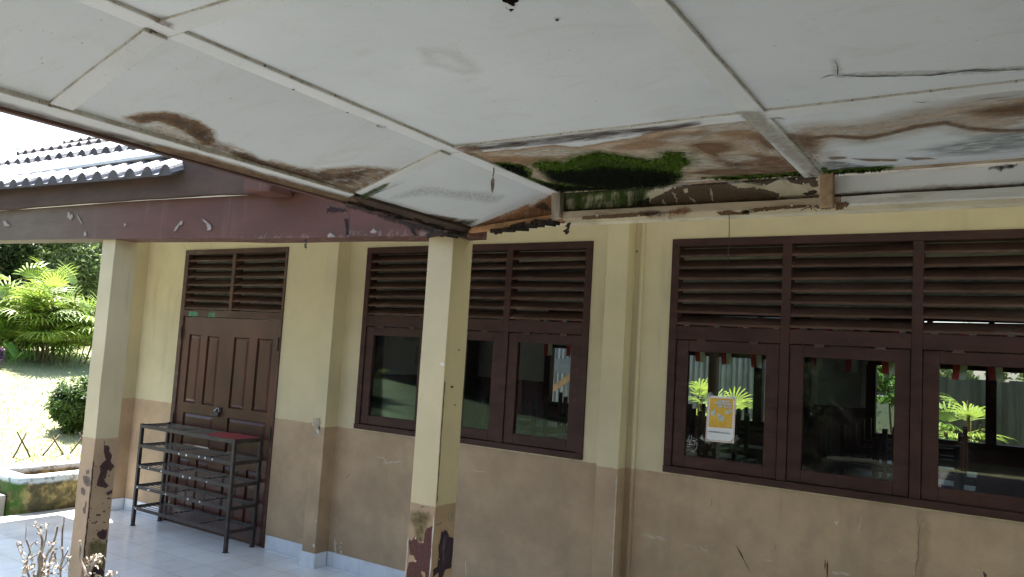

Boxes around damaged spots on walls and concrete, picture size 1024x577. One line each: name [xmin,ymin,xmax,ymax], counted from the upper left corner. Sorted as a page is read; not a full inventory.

crack [823,63,1020,78]
damp [126,112,476,236]
damp [564,195,819,217]
peeling [582,177,819,220]
damp [454,98,1024,193]
damp [835,183,1024,197]
peeling [80,441,115,557]
peeling [405,518,454,577]